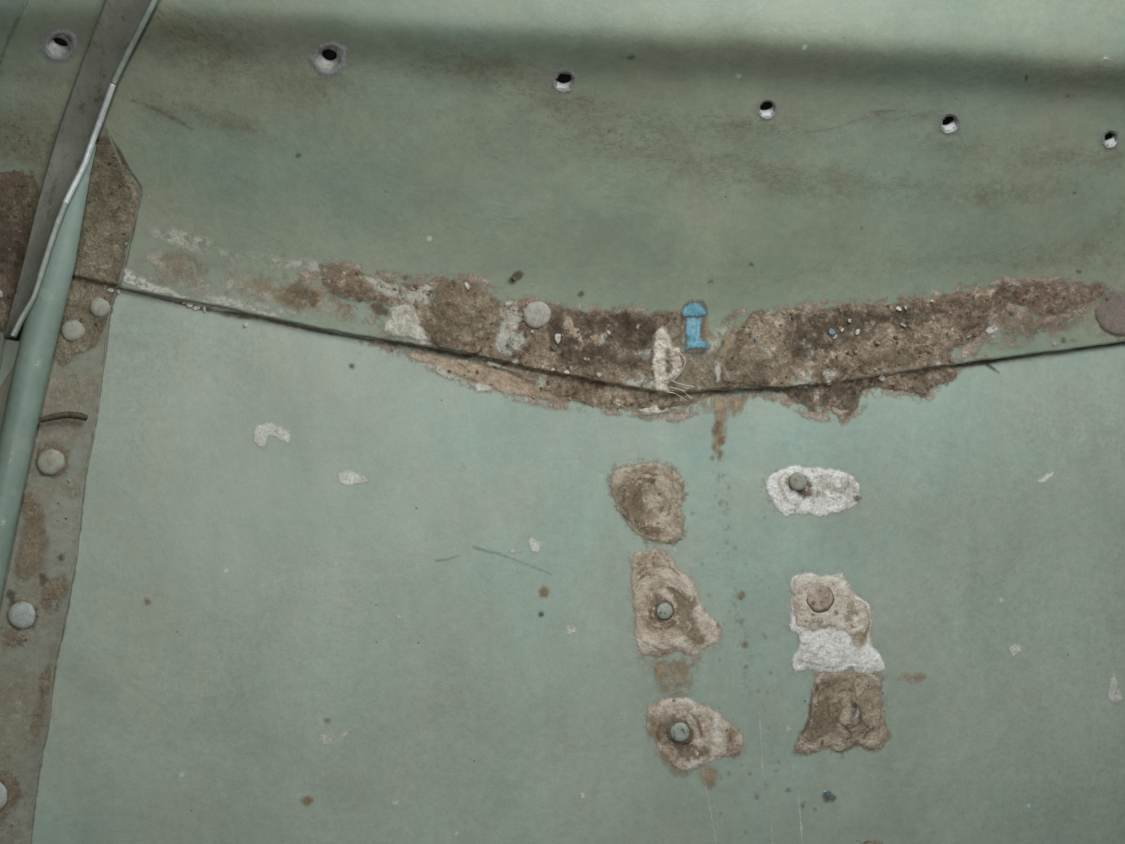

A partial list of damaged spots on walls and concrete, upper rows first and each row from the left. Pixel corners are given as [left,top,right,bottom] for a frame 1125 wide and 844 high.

peeling [106,229,539,327]
peeling [360,337,708,422]
rust [276,265,1125,458]
peeling [674,276,1106,424]